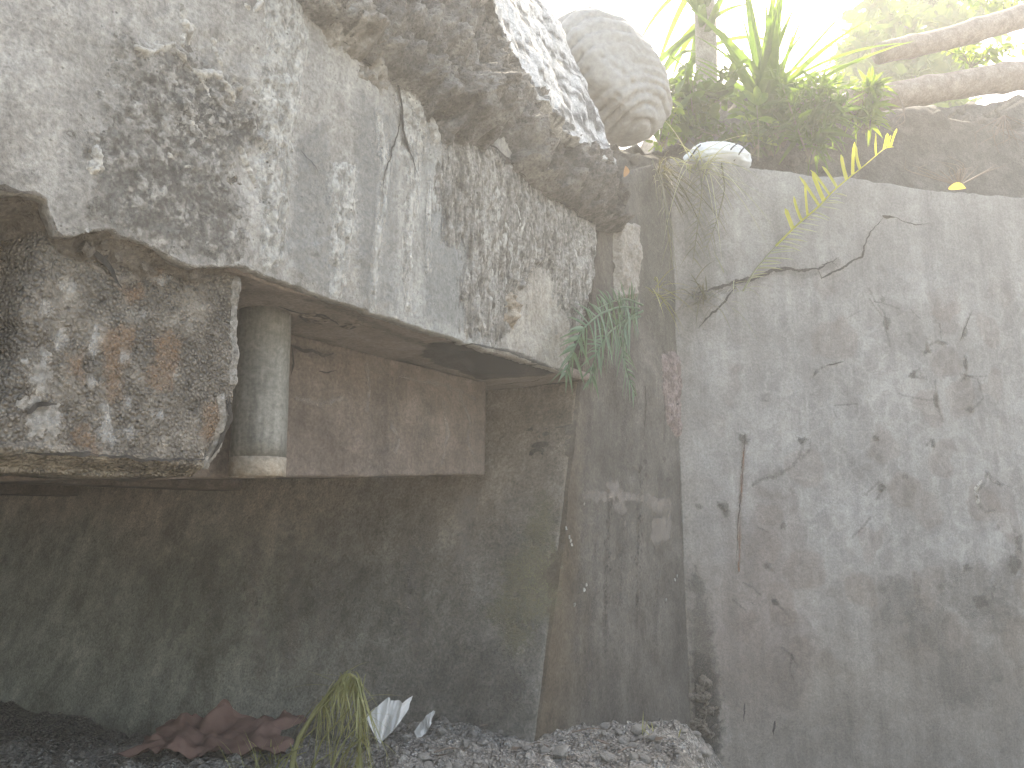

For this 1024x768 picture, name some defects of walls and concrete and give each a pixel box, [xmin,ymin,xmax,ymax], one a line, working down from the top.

crack [383,85,419,196]
peeling [431,141,597,353]
crack [699,215,922,327]
corrosion [736,434,745,572]